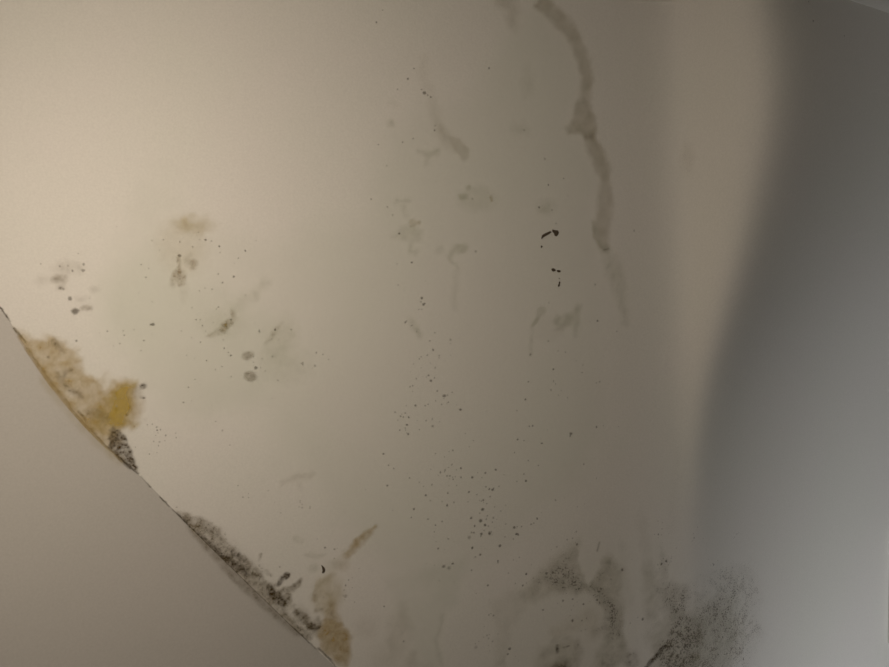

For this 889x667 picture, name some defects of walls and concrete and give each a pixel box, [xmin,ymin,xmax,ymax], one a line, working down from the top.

water stain [110,430,137,470]
water stain [185,515,321,636]